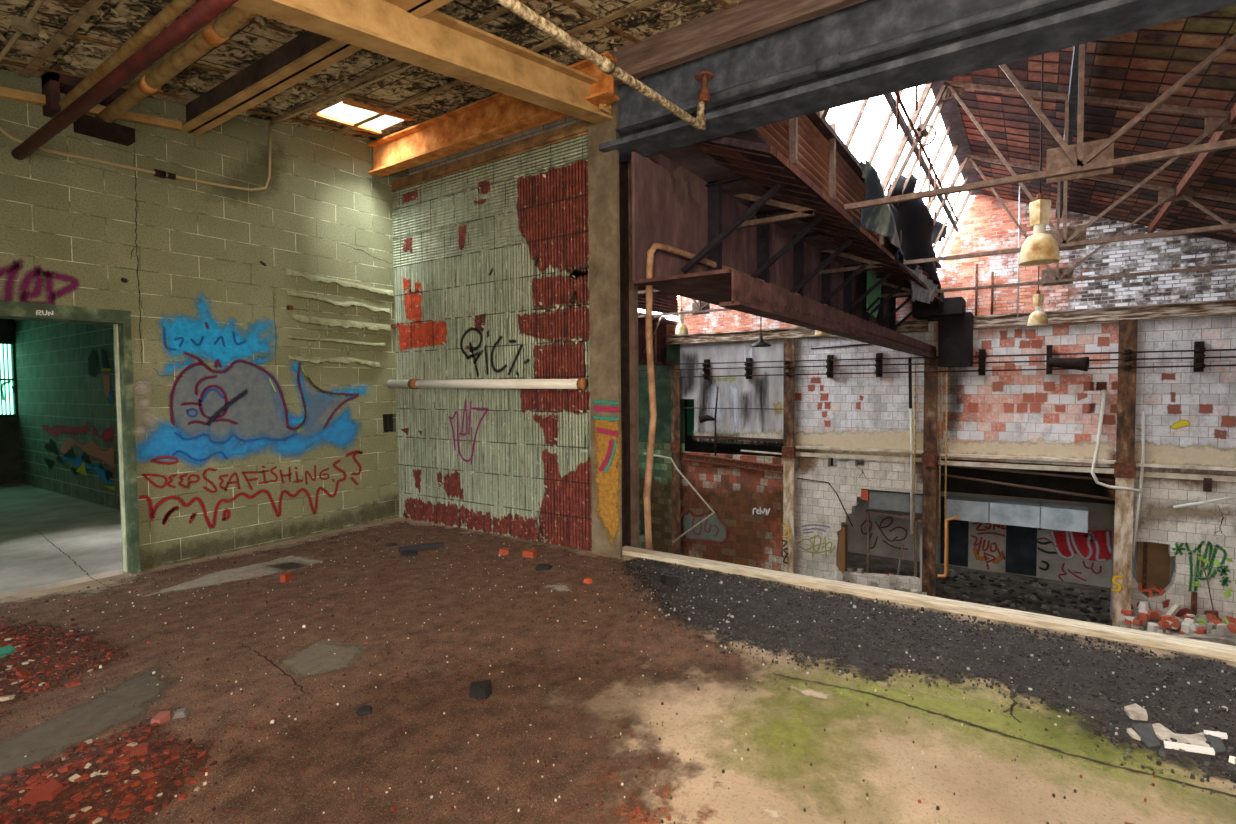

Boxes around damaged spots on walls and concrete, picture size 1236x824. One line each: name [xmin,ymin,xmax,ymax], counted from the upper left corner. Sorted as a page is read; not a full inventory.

rust [312,98,413,134]
peeling [394,160,592,551]
peeling [975,329,1042,359]
peeling [1097,337,1110,346]
peeling [795,377,831,427]
water stain [683,354,1114,459]
peeling [992,363,1118,425]